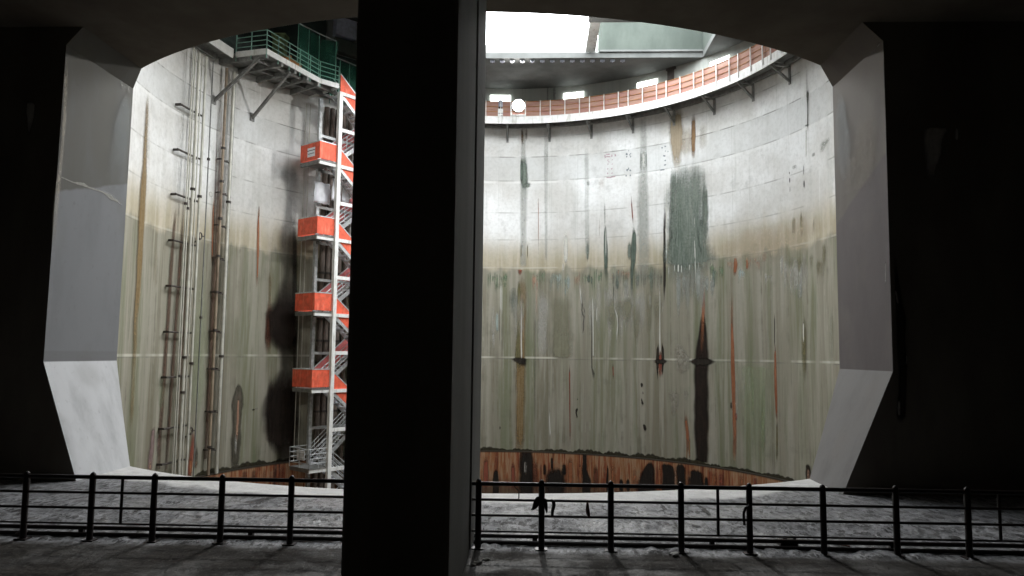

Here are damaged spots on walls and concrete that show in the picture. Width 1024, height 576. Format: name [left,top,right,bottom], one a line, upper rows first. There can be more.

damp [195,237,313,476]
damp [480,154,810,481]